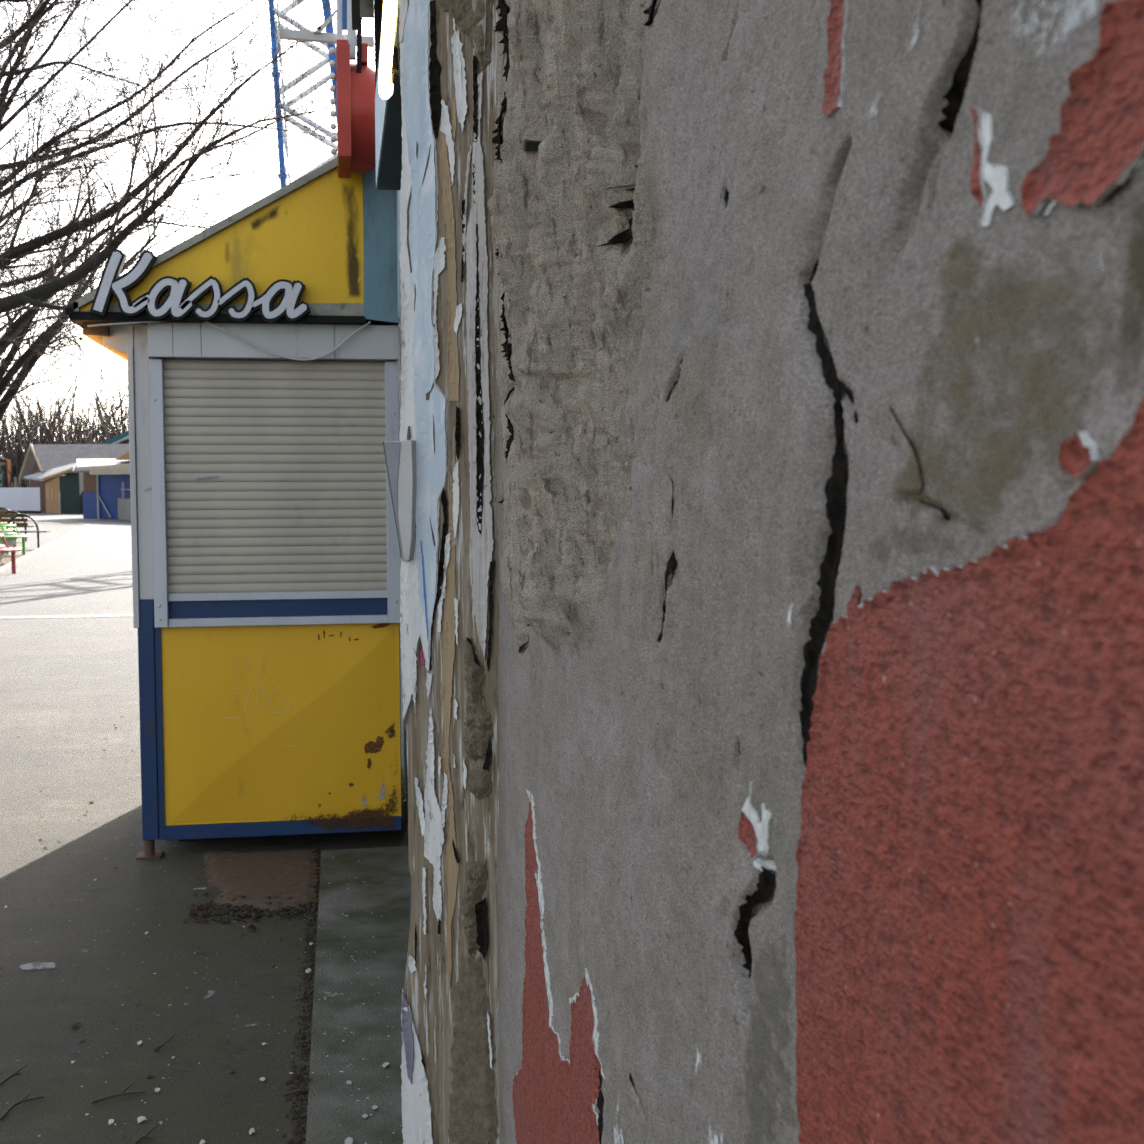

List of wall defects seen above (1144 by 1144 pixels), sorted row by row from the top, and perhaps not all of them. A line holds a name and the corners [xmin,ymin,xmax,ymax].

peeling [822,0,849,117]
crack [937,0,983,134]
peeling [970,0,1144,227]
crack [668,479,676,518]
crack [799,248,858,767]
crack [889,407,951,521]
spalling [397,0,733,1144]
crack [657,550,677,642]
rust [290,786,398,830]
rust [364,736,384,769]
peeling [794,398,1144,1144]
crack [734,866,776,978]